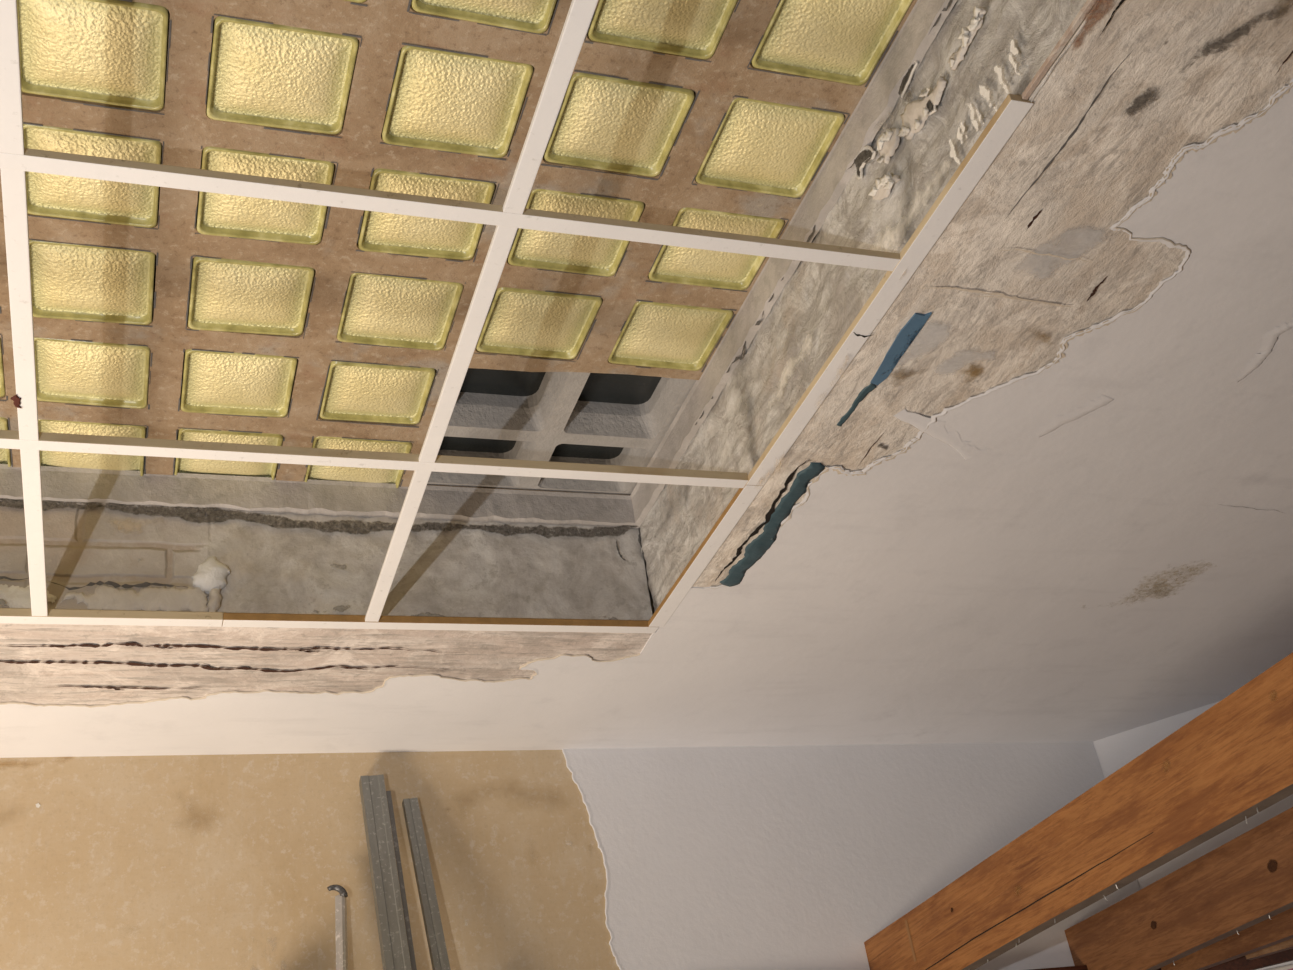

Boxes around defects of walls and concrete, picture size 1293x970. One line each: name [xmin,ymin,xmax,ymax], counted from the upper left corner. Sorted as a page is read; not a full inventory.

rust [1074,0,1113,48]
flaking render [692,0,1293,589]
crack [0,576,189,590]
crack [0,643,466,690]
flaking render [0,605,652,708]
peeling [562,749,624,970]